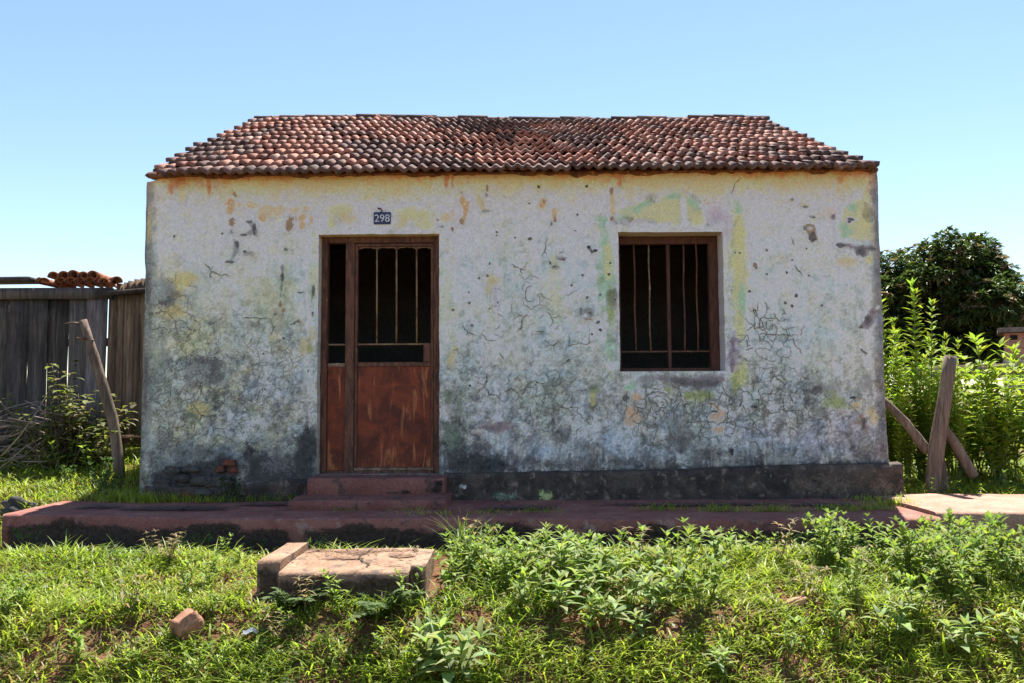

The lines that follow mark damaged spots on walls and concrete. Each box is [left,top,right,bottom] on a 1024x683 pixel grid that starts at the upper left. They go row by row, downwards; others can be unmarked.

peeling [221,191,317,266]
peeling [592,186,711,233]
leakage [142,349,154,420]
flaking render [147,450,244,498]
leakage [181,348,233,392]
crack [145,263,305,456]
leakage [234,415,316,485]
crack [442,240,593,437]
leakage [440,334,887,506]
crack [617,302,877,469]